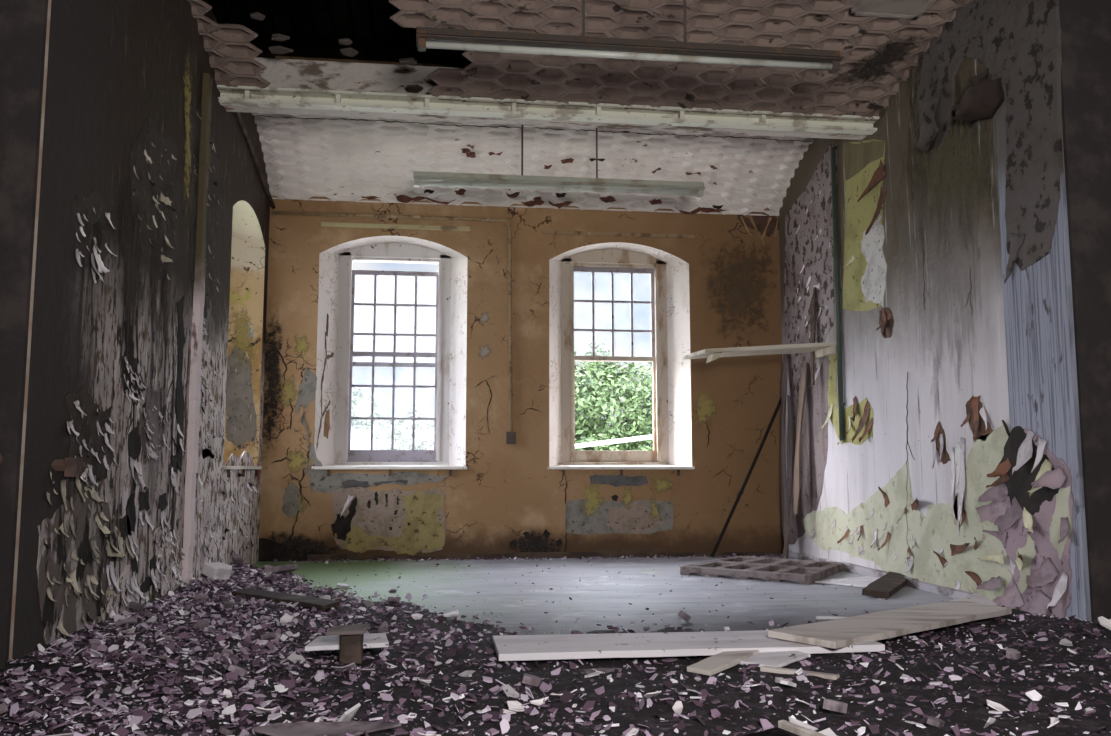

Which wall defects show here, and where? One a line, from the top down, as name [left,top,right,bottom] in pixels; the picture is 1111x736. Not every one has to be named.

peeling [36,107,271,644]
crack [228,332,334,537]
flaking render [271,363,448,555]
flaking render [396,189,466,205]
flaking render [461,148,502,158]
flaking render [507,192,574,209]
flaking render [565,474,674,535]
flaking render [677,205,727,214]
peeling [795,264,827,343]
peeling [842,139,892,337]
damp [833,34,993,253]
peeling [787,346,1074,618]